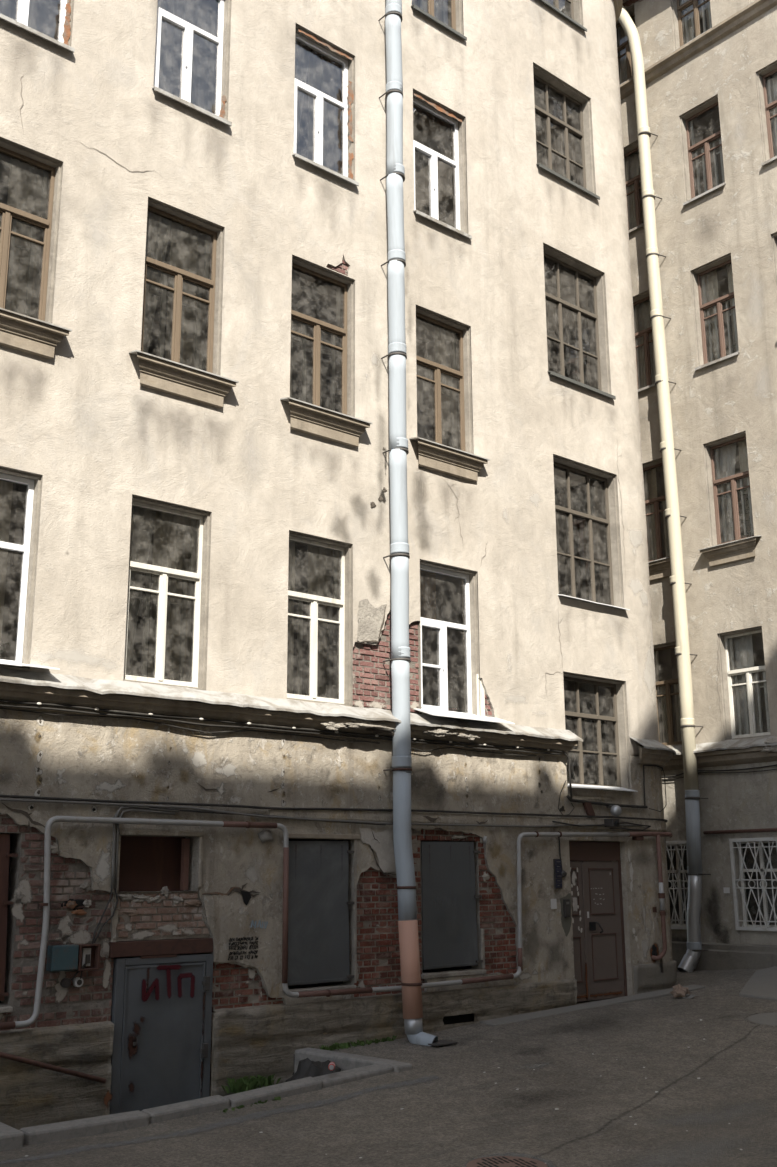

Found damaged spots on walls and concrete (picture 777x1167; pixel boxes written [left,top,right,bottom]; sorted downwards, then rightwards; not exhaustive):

crack [75,140,158,173]
spalling [353,599,392,711]
spalling [409,621,420,714]
peeling [183,748,237,795]
spalling [0,813,212,1031]
spalling [354,828,402,997]
spalling [212,963,286,1020]